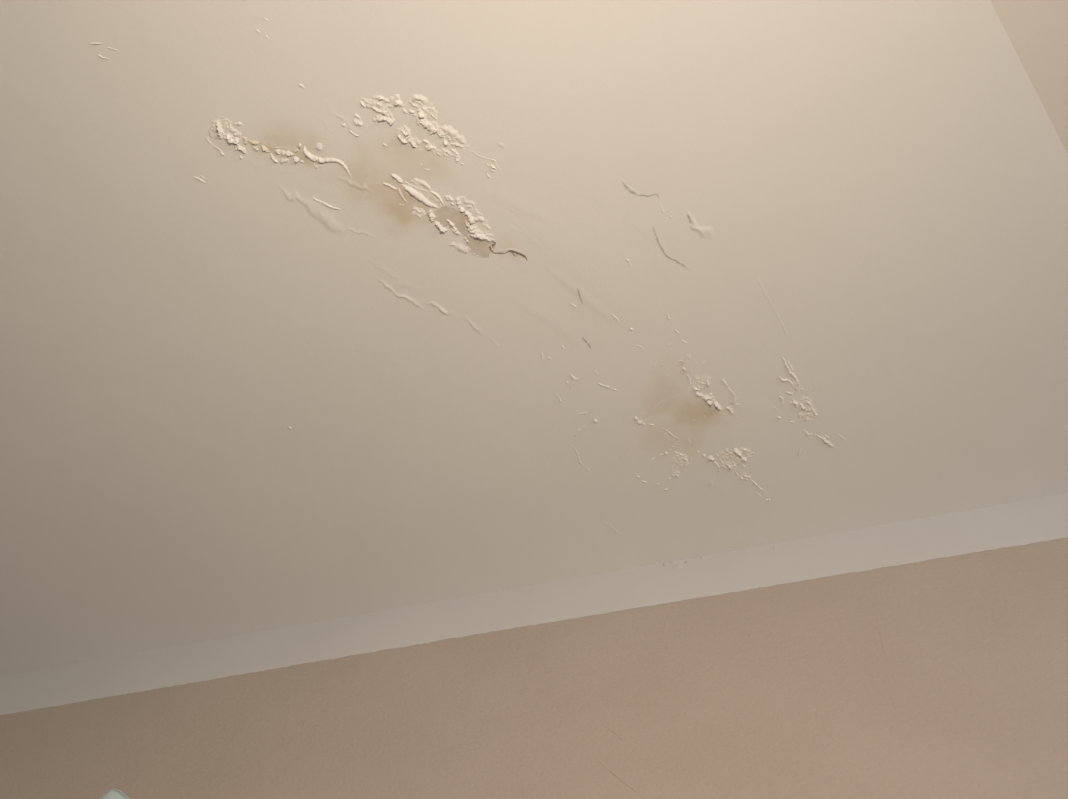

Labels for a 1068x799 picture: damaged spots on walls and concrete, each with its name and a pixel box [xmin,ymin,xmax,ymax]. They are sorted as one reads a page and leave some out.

peeling [206,116,352,177]
leakage [220,100,488,259]
peeling [342,94,501,178]
peeling [383,164,495,258]
crack [489,241,528,260]
leakage [488,227,539,272]
leakage [613,347,759,475]
peeling [635,411,770,501]
peeling [679,355,741,421]
peeling [772,341,846,456]